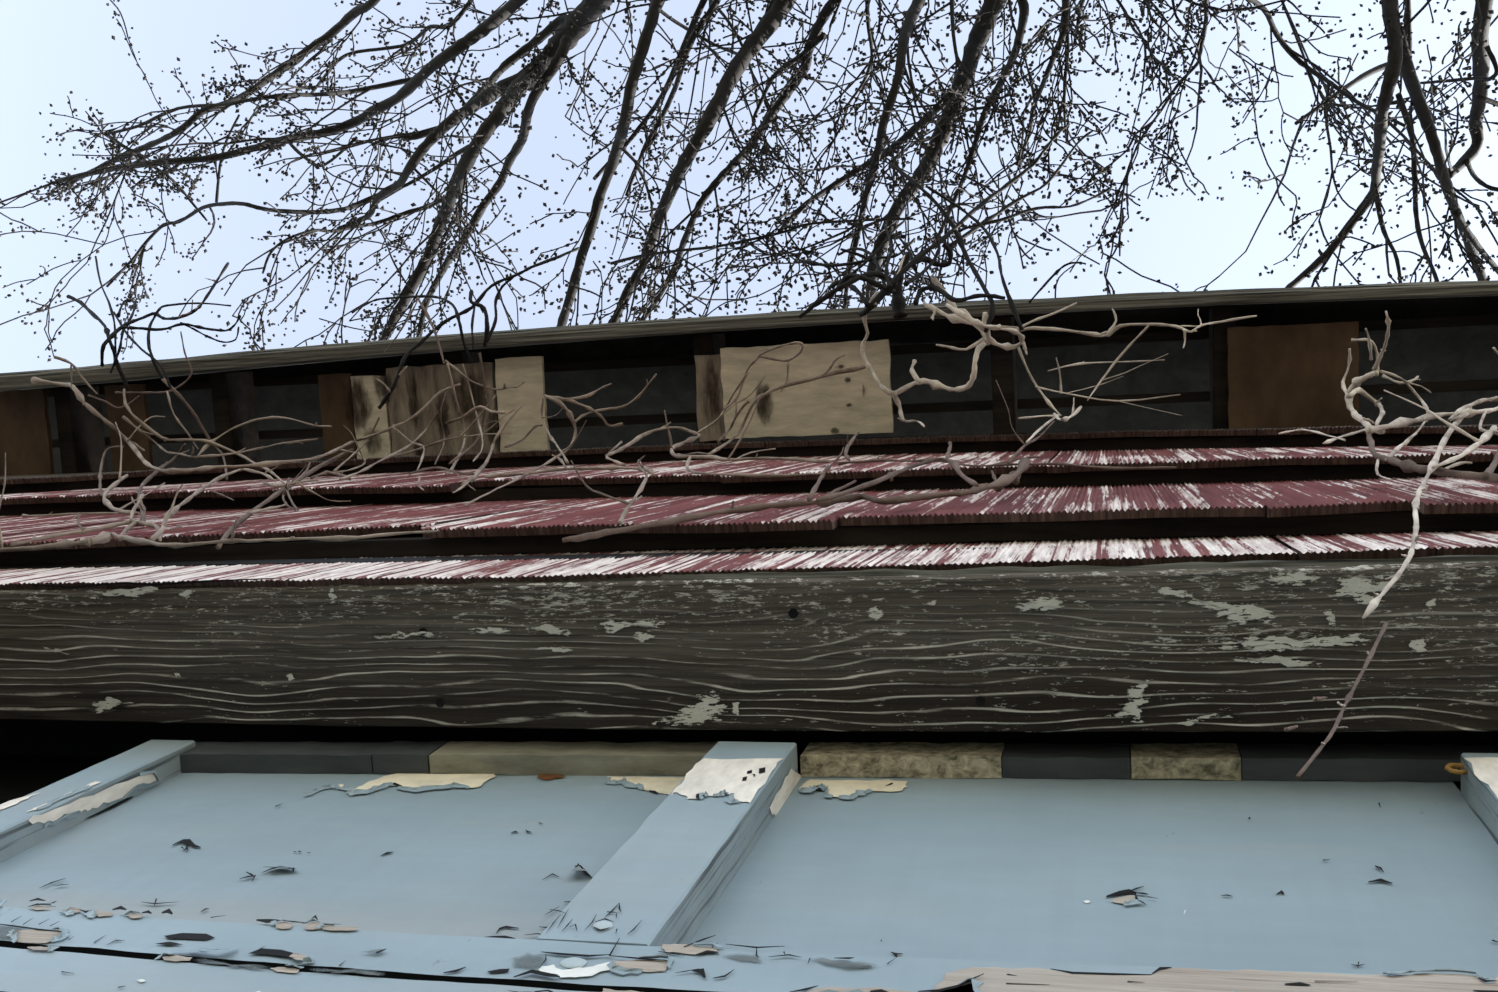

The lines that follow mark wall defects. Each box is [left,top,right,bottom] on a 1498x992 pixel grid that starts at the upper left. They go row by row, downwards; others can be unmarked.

peeling [1158,587,1192,598]
peeling [1269,572,1319,586]
peeling [531,624,572,653]
peeling [1218,603,1371,667]
peeling [92,697,133,713]
peeling [0,770,160,828]
peeling [303,773,495,797]
peeling [605,758,907,815]
peeling [1465,757,1498,798]
peeling [0,898,173,952]
peeling [487,935,895,992]
peeling [790,967,1498,992]